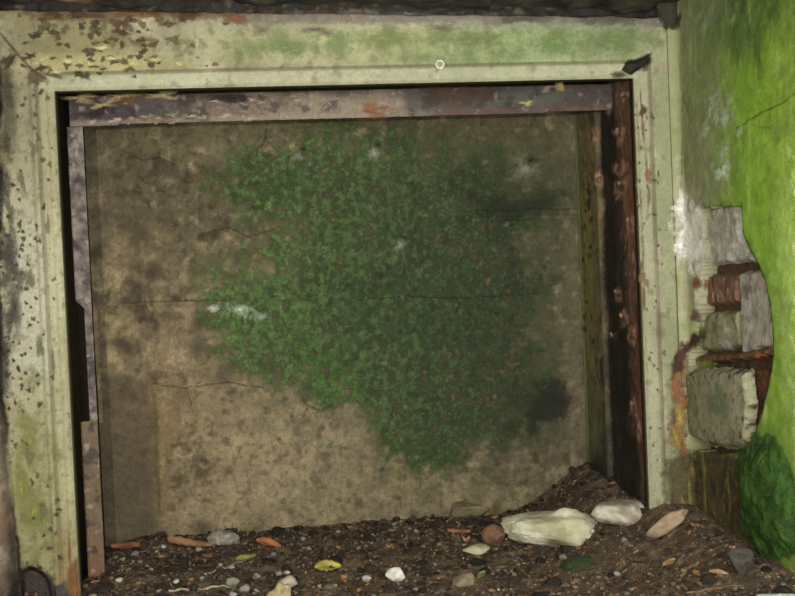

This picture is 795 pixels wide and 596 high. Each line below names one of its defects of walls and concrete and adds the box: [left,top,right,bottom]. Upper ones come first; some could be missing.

peeling [21,11,204,79]
peeling [30,113,53,168]
peeling [65,93,231,125]
rust [622,88,651,247]
damp [716,146,730,180]
peeling [4,172,50,252]
damp [674,193,707,276]
peeling [12,261,39,323]
peeling [5,333,55,380]
rust [691,277,701,321]
flaking render [684,206,774,453]
rust [669,333,705,456]